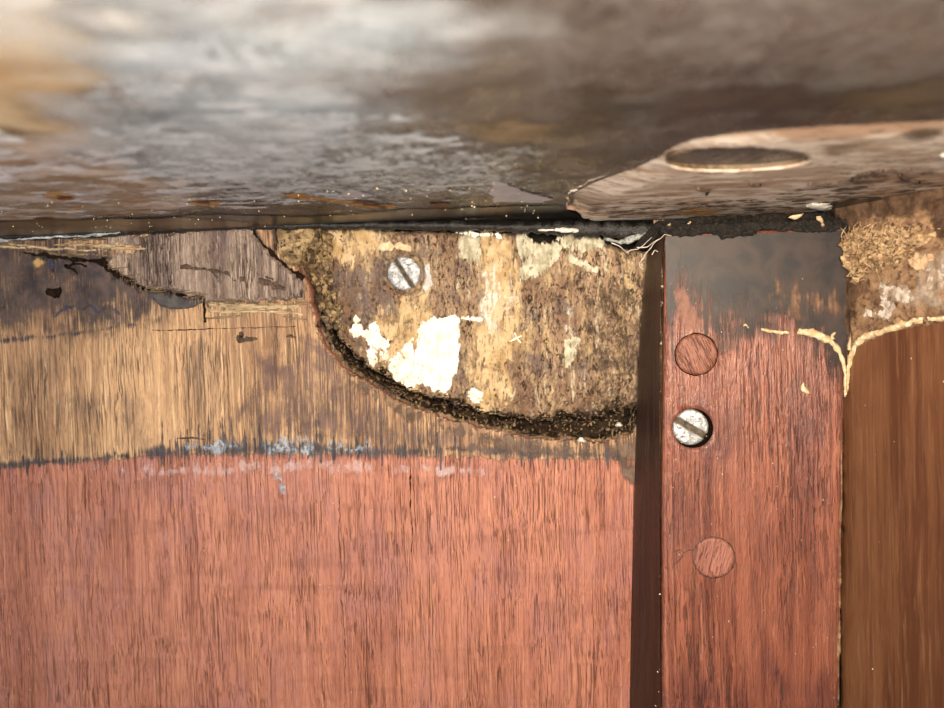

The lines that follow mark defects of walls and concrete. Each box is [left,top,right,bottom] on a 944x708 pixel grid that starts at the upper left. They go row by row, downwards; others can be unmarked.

peeling [0,84,944,282]
peeling [0,229,636,468]
water stain [0,277,642,485]
water stain [665,230,847,376]
peeling [863,251,944,320]